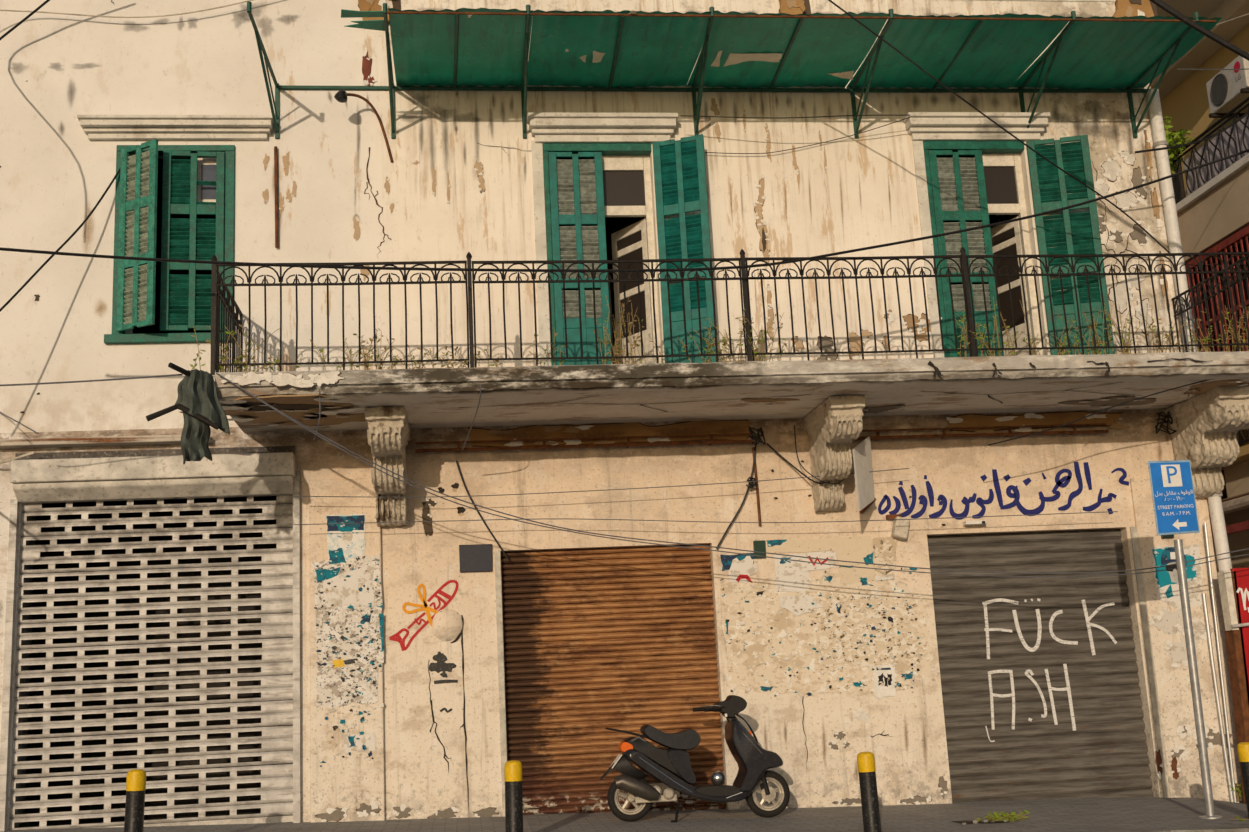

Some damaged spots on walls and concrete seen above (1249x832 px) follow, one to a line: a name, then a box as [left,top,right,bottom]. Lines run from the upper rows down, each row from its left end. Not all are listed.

peeling [763,123,772,162]
peeling [792,144,800,188]
crack [364,147,391,257]
flaking render [754,174,771,269]
peeling [1094,128,1170,352]
flaking render [765,284,776,342]
flaking render [791,310,942,360]
flaking render [468,420,753,447]